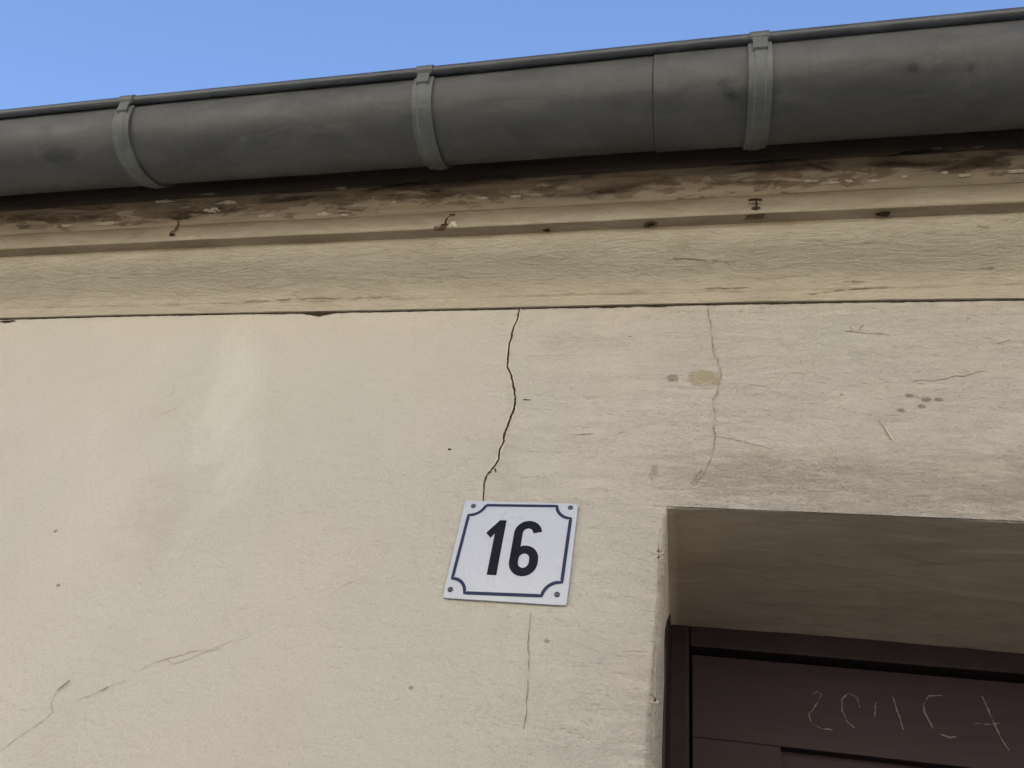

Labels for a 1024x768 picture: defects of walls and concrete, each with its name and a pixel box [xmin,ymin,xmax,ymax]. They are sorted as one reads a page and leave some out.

leakage [874,149,1007,169]
crack [0,258,1024,501]
crack [2,639,242,750]
crack [523,613,531,726]